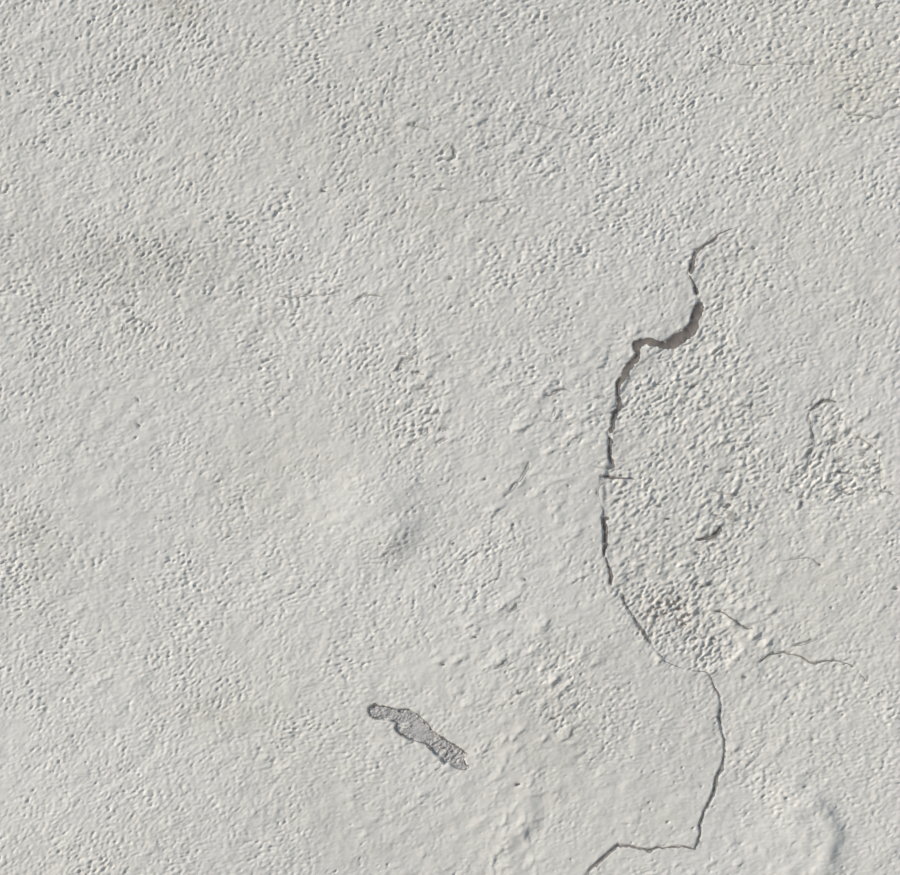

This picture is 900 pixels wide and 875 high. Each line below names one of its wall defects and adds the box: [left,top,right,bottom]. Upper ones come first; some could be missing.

crack [543,388,569,422]
crack [712,489,736,497]
crack [586,228,732,875]
spalling [367,703,469,770]